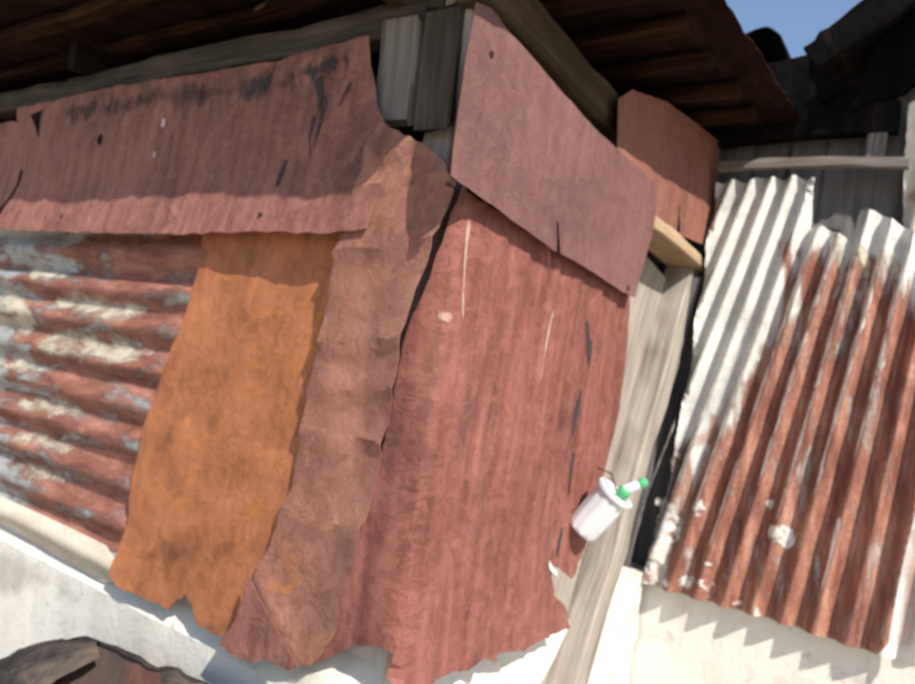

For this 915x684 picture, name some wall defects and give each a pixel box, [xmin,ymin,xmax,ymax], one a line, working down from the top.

rust [0,233,202,583]
rust [639,233,915,655]